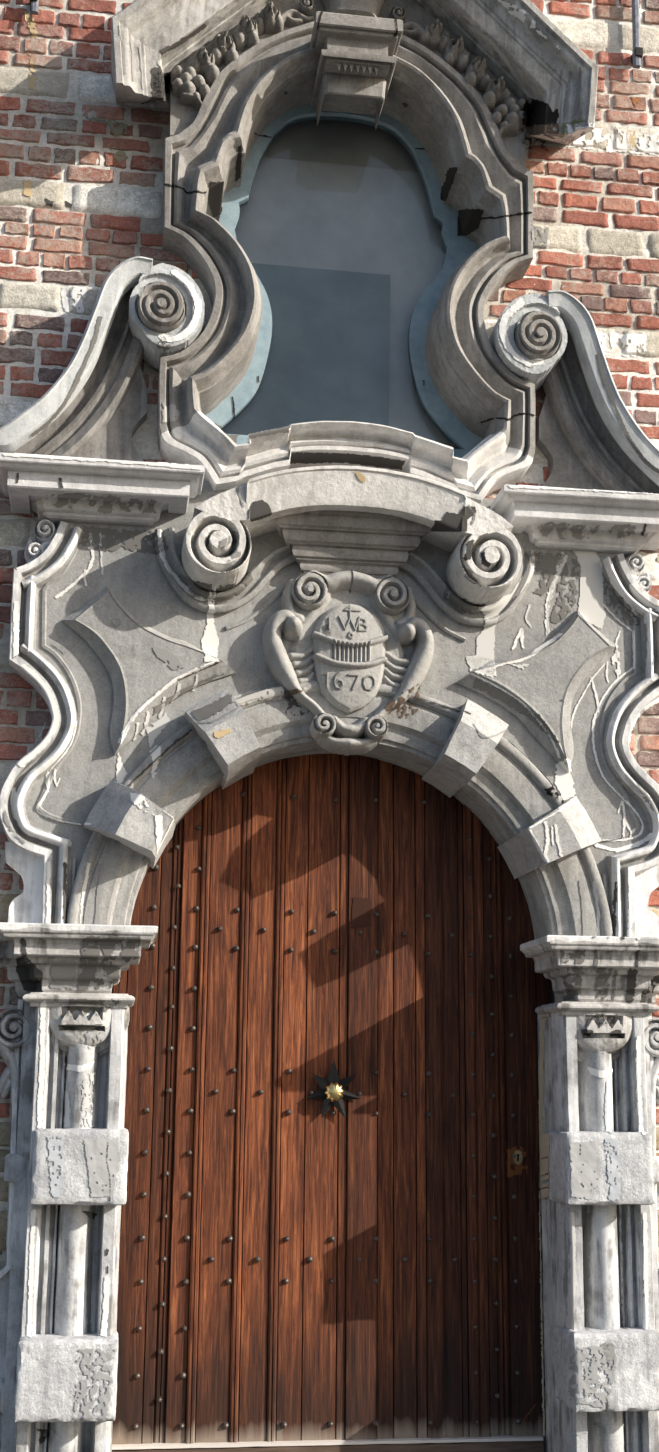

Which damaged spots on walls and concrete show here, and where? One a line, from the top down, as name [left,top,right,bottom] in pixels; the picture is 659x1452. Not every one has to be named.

crack [157,183,207,194]
crack [480,211,532,220]
leakage [560,880,646,1135]